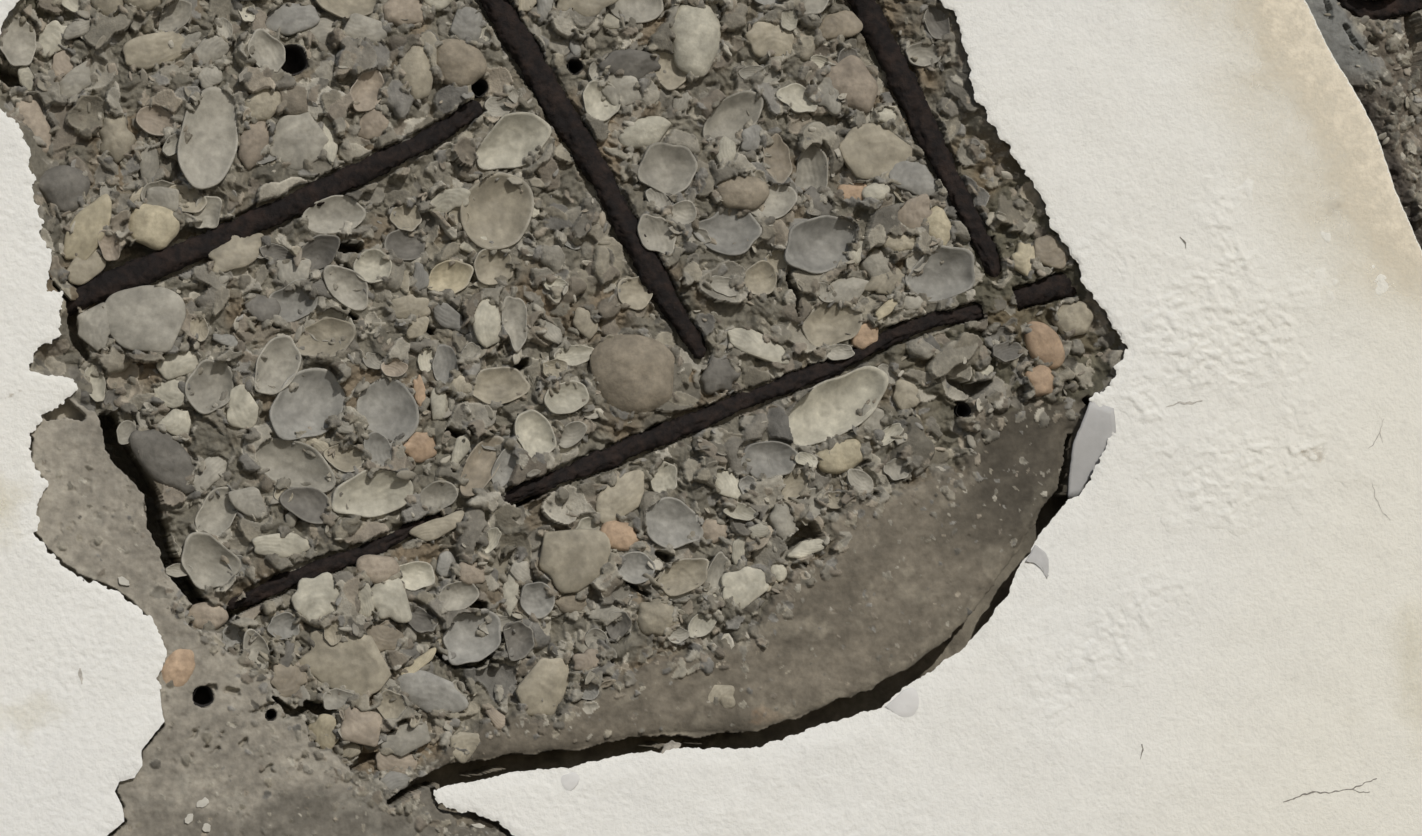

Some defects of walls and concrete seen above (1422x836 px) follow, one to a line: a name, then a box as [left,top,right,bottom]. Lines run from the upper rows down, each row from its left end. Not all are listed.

spalling [0,0,1127,836]
spalling [1305,0,1422,250]